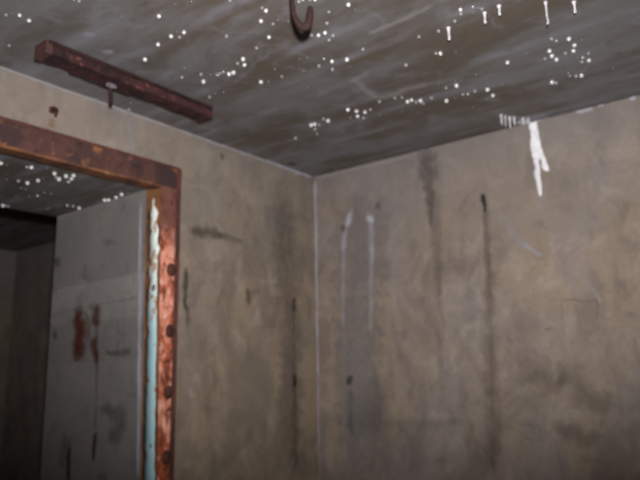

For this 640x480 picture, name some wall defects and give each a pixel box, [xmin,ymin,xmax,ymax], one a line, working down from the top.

corrosion [0,116,182,480]
water stain [0,66,408,428]
water stain [499,114,550,196]